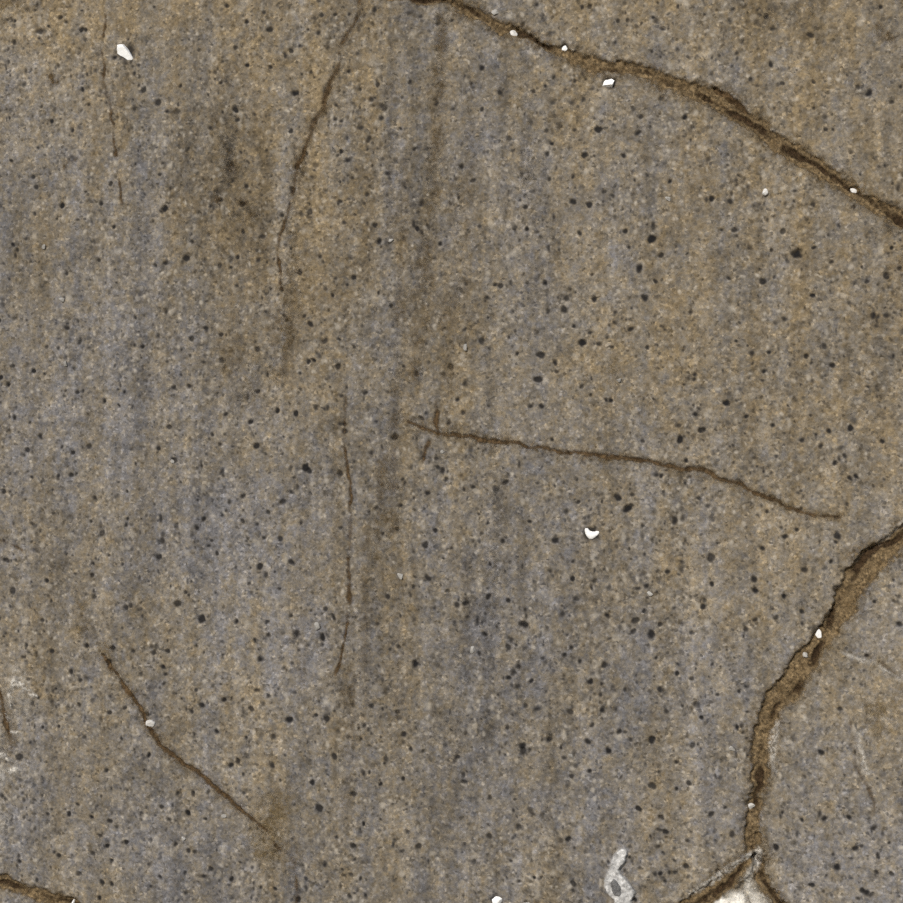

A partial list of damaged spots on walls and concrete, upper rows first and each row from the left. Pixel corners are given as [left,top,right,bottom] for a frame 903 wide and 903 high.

crack [295,0,360,177]
crack [387,0,903,230]
crack [277,206,290,289]
crack [407,409,842,520]
crack [102,654,280,850]
crack [680,522,903,903]
crack [0,874,80,903]